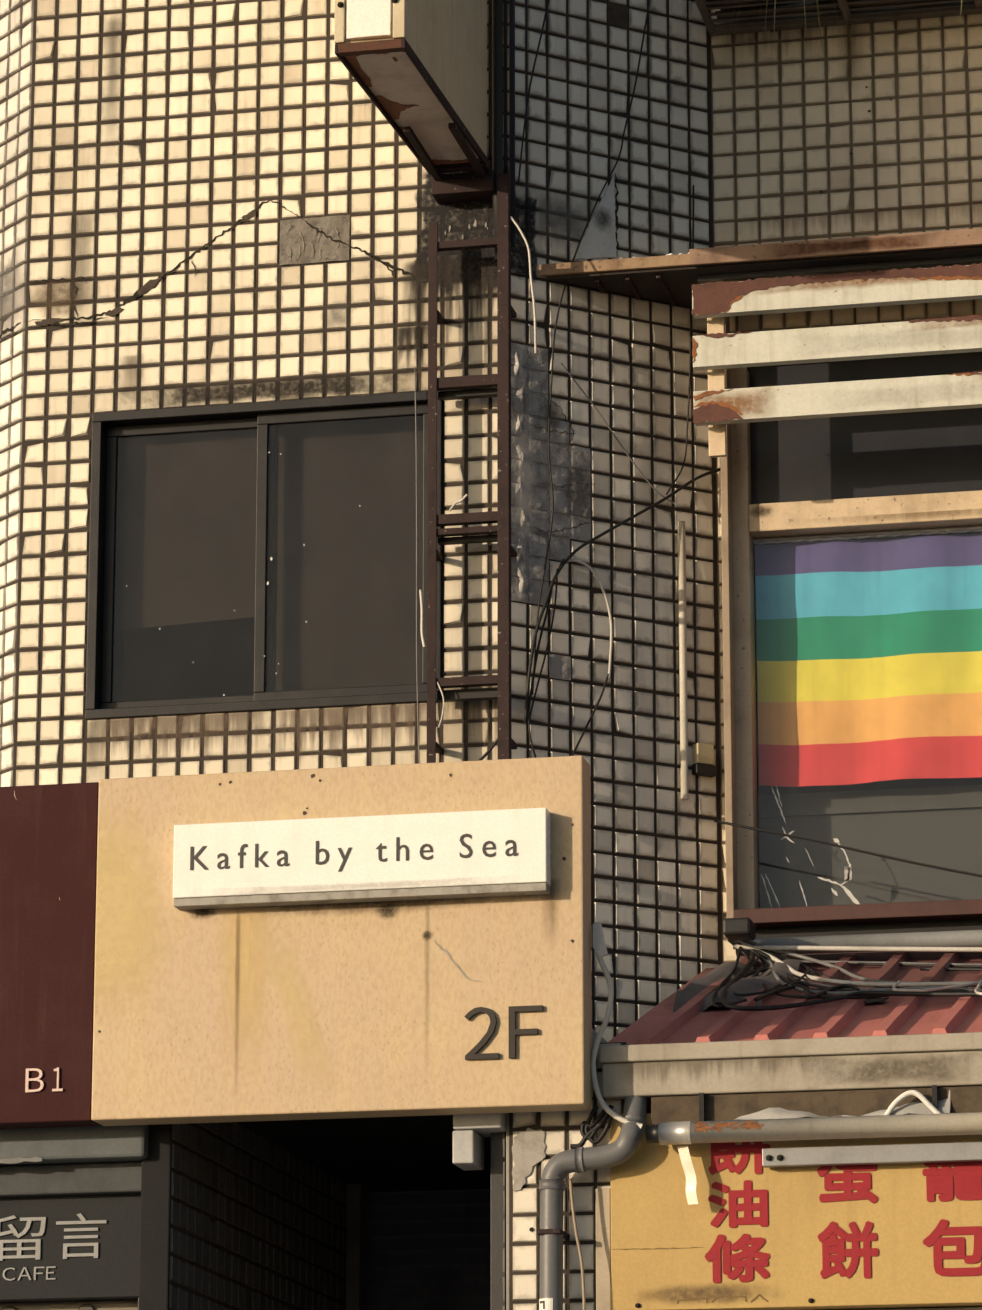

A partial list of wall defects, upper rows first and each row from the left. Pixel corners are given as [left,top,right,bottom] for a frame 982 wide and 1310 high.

rust [344,55,419,136]
crack [0,199,301,342]
peeling [279,215,350,265]
crack [350,245,428,285]
damp [397,257,497,364]
rust [691,263,982,316]
rust [779,237,918,256]
rust [692,331,753,362]
rust [692,389,760,424]
peeling [511,342,594,605]
damp [105,713,254,746]
damp [283,704,420,747]